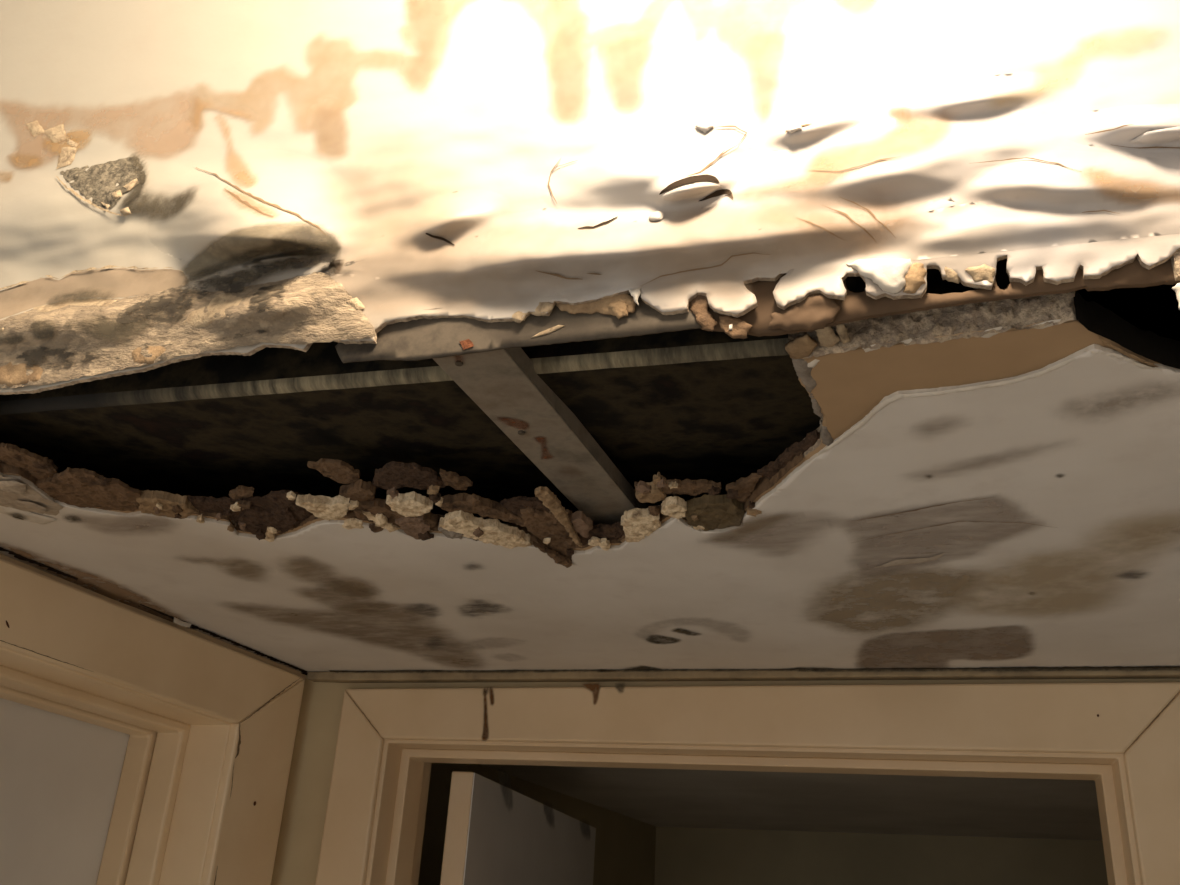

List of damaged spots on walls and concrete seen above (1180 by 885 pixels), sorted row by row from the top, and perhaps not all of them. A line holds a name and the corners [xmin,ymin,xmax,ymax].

spalling [56,155,193,218]
mould [0,224,355,368]
spalling [0,265,376,388]
peeling [689,295,752,339]
peeling [847,258,927,294]
peeling [1172,283,1180,310]
peeling [768,291,1104,455]
rust [499,418,552,459]
water stain [769,497,1180,672]
water stain [238,560,740,673]
rust [482,688,494,741]
rust [583,683,600,704]